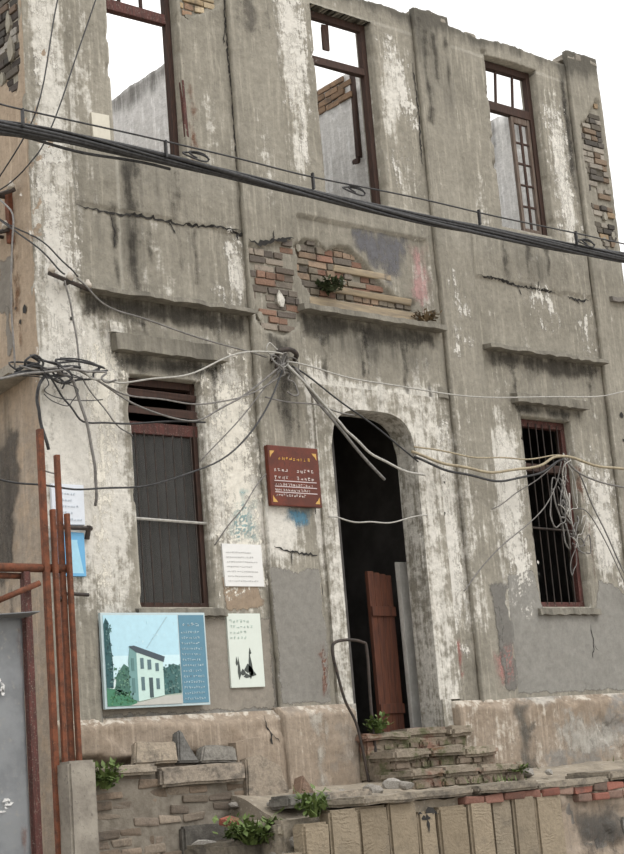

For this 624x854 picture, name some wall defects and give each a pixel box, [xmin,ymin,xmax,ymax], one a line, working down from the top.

spalling [0,0,21,92]
water stain [244,0,255,31]
peeling [273,0,352,163]
water stain [423,30,449,95]
spalling [581,104,617,250]
crack [75,205,294,247]
spalling [211,226,411,332]
crack [479,274,587,303]
water stain [269,335,291,419]
peeling [578,446,621,572]
water stain [514,705,535,768]
water stain [559,710,618,753]